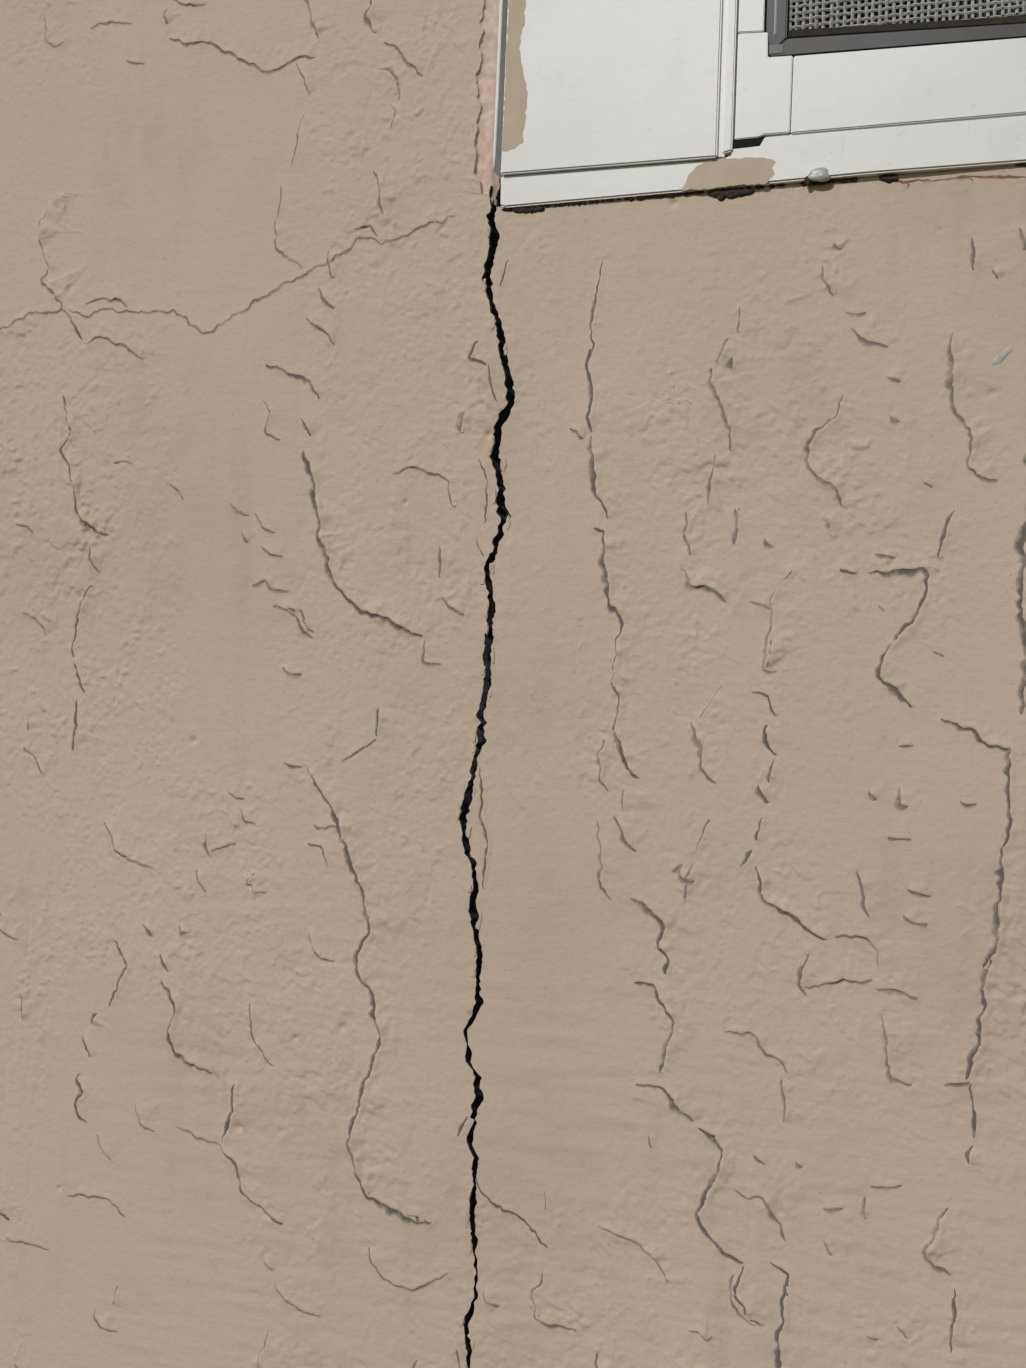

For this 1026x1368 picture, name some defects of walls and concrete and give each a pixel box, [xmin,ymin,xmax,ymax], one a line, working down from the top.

crack [0,185,551,1368]
crack [569,261,641,780]
crack [740,686,828,940]
crack [839,451,1026,1165]
crack [630,894,795,1368]
crack [948,1288,963,1354]